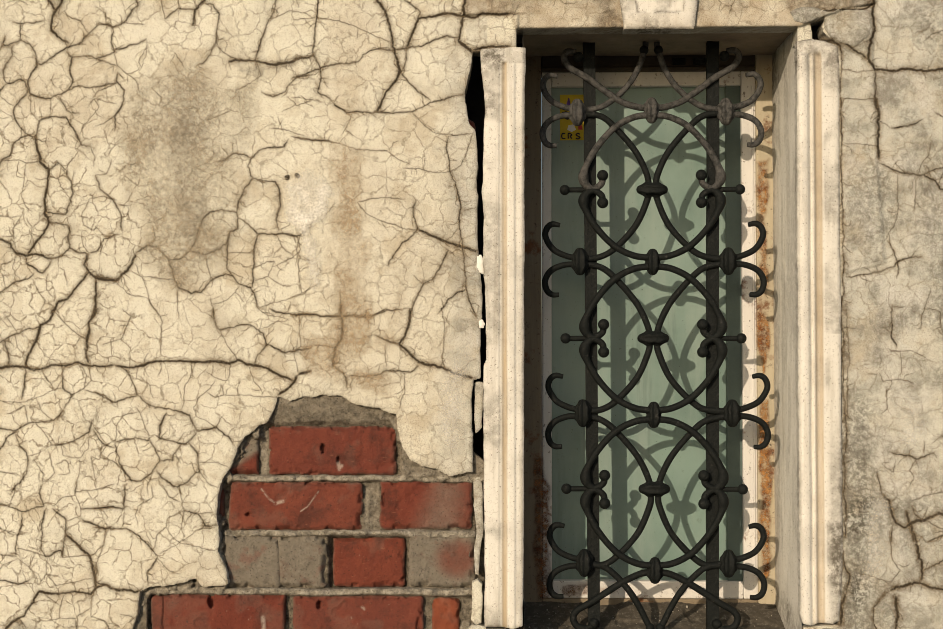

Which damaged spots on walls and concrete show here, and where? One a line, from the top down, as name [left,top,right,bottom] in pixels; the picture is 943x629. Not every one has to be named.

corrosion [757,162,769,225]
crack [0,0,516,629]
flaking render [134,395,496,629]
flaking render [474,381,484,433]
corrosion [757,313,770,373]
corrosion [758,401,772,579]
crack [821,0,943,629]